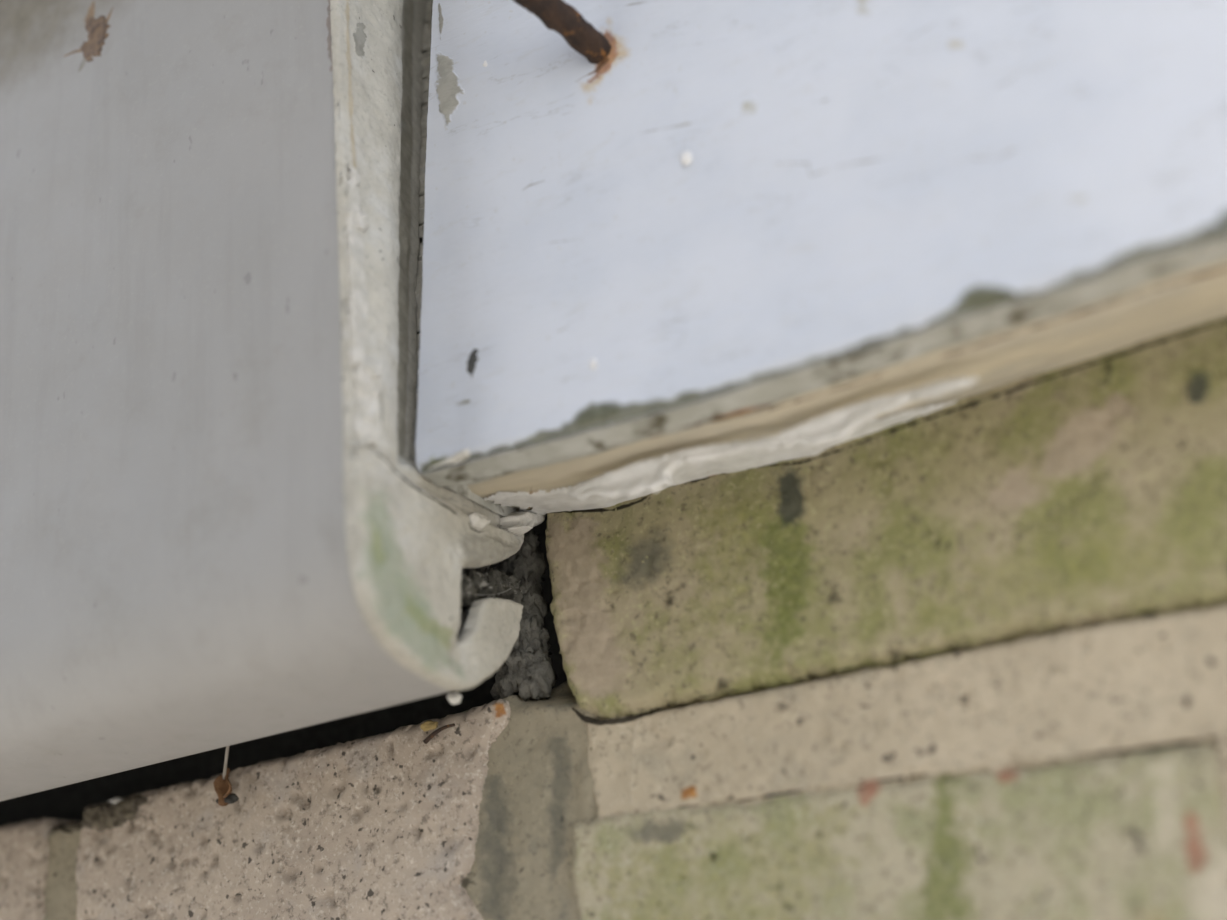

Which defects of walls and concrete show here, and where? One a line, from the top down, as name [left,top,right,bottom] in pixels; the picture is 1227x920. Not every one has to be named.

peeling [434,3,465,127]
corrosion [572,11,635,109]
peeling [456,377,980,702]
damp [668,480,772,659]
damp [1127,750,1199,866]
damp [1183,834,1227,920]